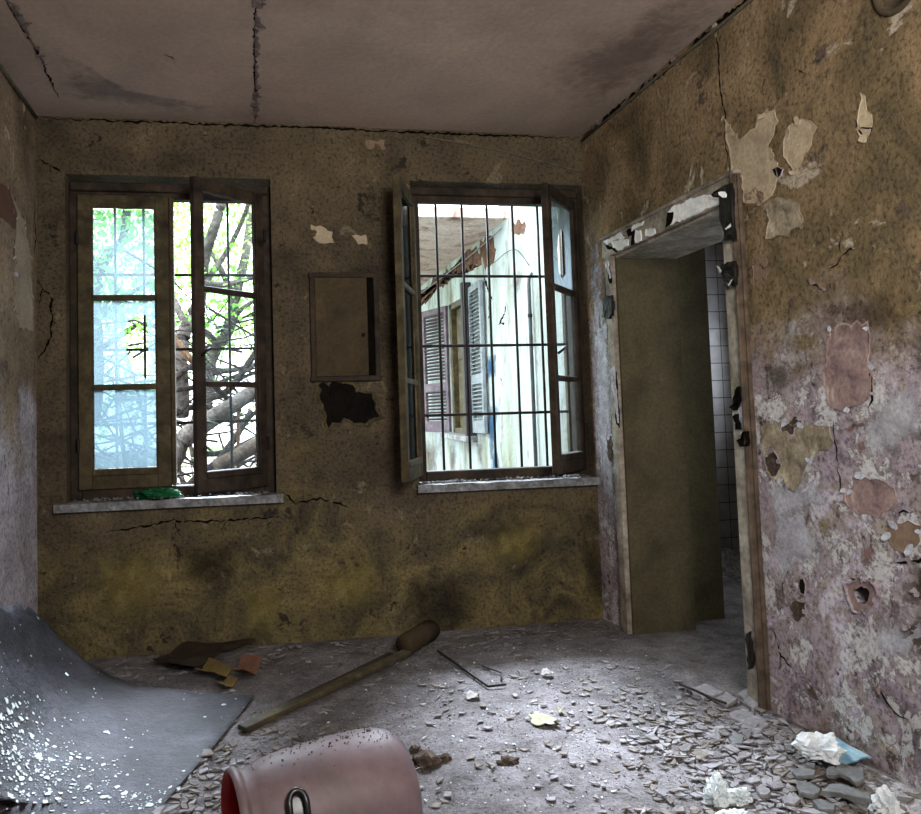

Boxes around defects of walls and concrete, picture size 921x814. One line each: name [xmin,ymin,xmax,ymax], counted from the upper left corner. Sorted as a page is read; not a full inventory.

crack [6,0,747,172]
peeling [603,188,727,252]
peeling [724,109,817,239]
peeling [854,93,873,143]
flaking render [789,578,808,624]
peeling [840,472,921,652]